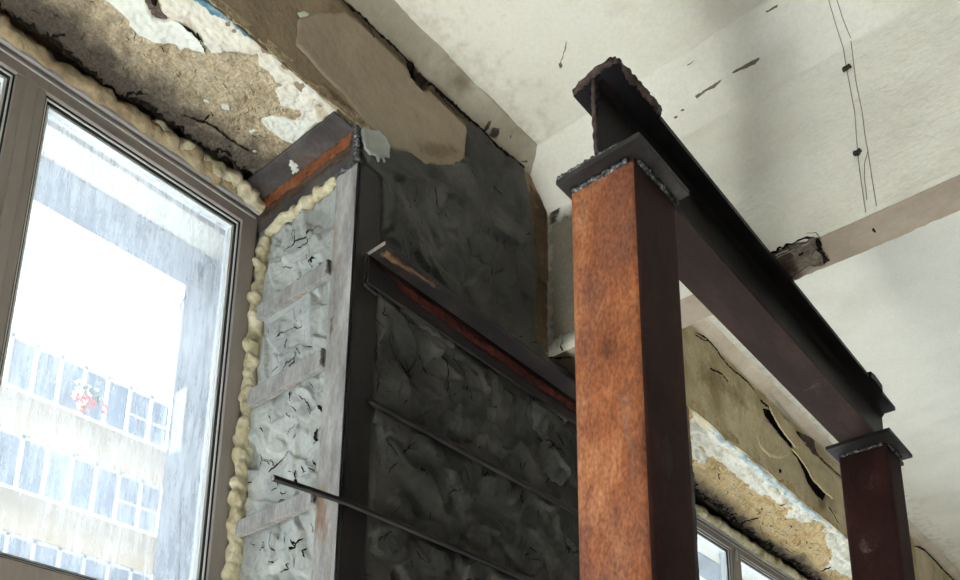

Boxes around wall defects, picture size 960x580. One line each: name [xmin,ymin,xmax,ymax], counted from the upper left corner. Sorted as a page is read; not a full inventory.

crack [0,1,278,172]
peeling [105,0,337,144]
spalling [406,61,429,92]
corrosion [263,132,353,217]
spalling [771,232,830,279]
crack [298,395,322,441]
crack [695,332,841,477]
crack [269,451,297,502]
peeling [688,406,852,578]
crack [281,539,302,572]
crack [915,546,955,580]